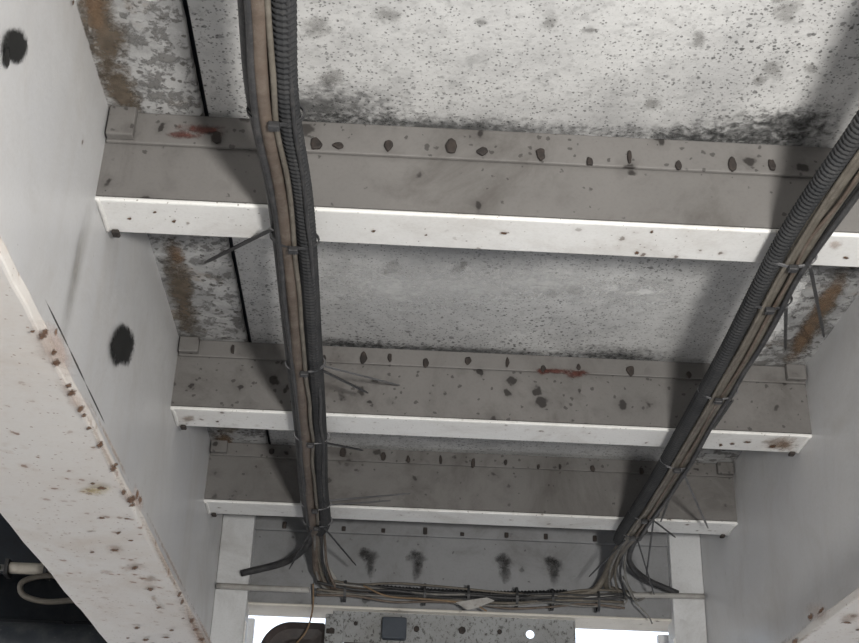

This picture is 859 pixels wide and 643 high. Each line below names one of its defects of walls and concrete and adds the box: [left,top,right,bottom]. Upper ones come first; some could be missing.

rust [72,0,141,109]
damp [299,91,368,122]
damp [374,120,529,132]
mould [656,114,822,145]
rust [164,239,197,332]
rust [785,273,845,361]
rust [538,369,587,378]